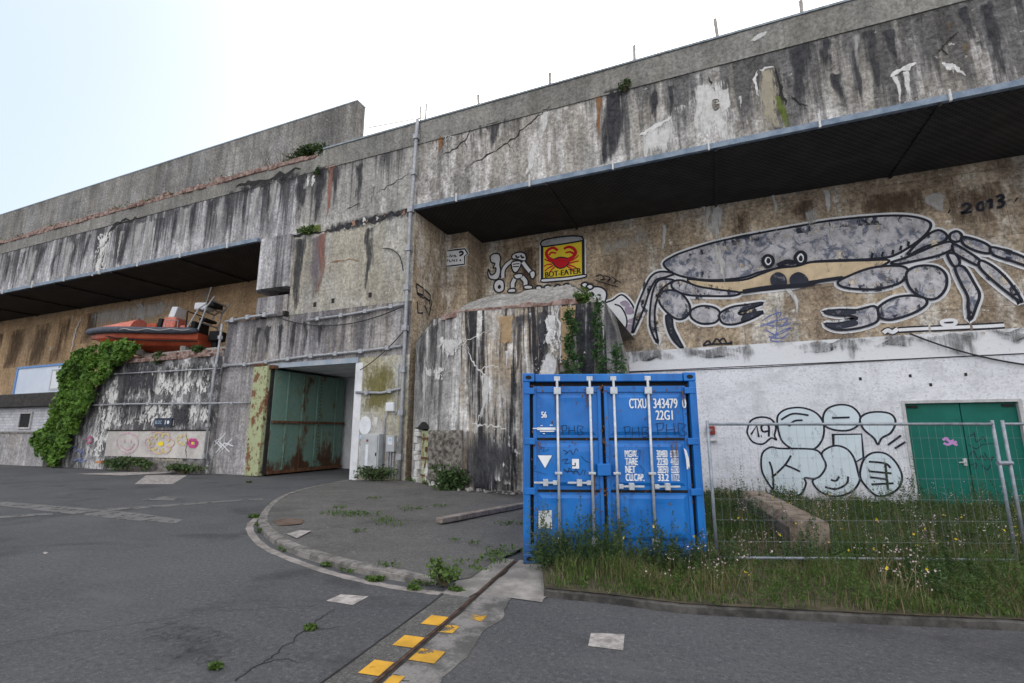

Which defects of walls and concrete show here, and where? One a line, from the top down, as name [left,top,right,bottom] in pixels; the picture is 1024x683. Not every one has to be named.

crack [443,107,549,168]
water stain [601,88,624,164]
peeling [752,66,787,127]
water stain [783,38,846,107]
water stain [852,29,916,101]
water stain [942,62,966,76]
water stain [207,163,372,237]
water stain [293,235,324,308]
rust [318,233,360,271]
water stain [364,228,373,287]
peeling [86,362,213,458]
water stain [466,309,559,487]